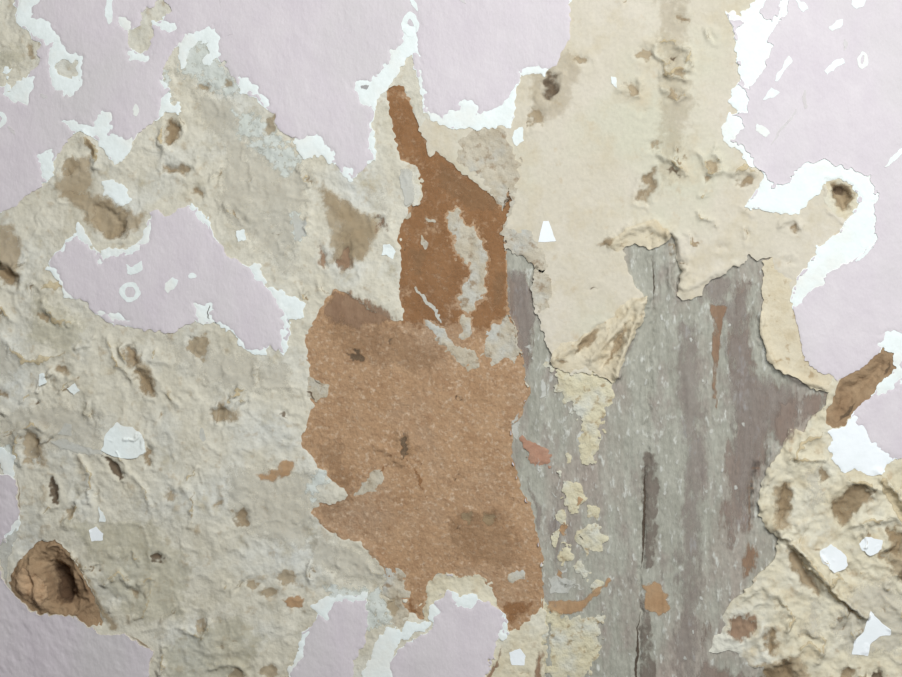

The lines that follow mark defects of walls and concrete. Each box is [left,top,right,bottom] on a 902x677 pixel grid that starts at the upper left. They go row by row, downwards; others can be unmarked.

spalling [0,0,548,677]
spalling [418,0,902,677]